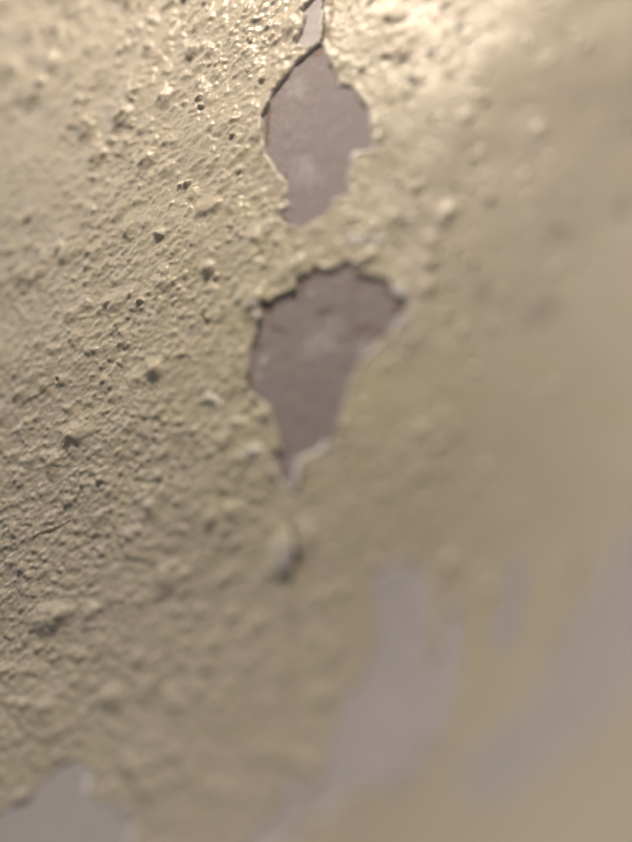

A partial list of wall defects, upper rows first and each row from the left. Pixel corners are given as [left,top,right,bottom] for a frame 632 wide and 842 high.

peeling [259,0,375,230]
crack [320,0,334,43]
peeling [242,259,414,492]
peeling [0,758,138,842]